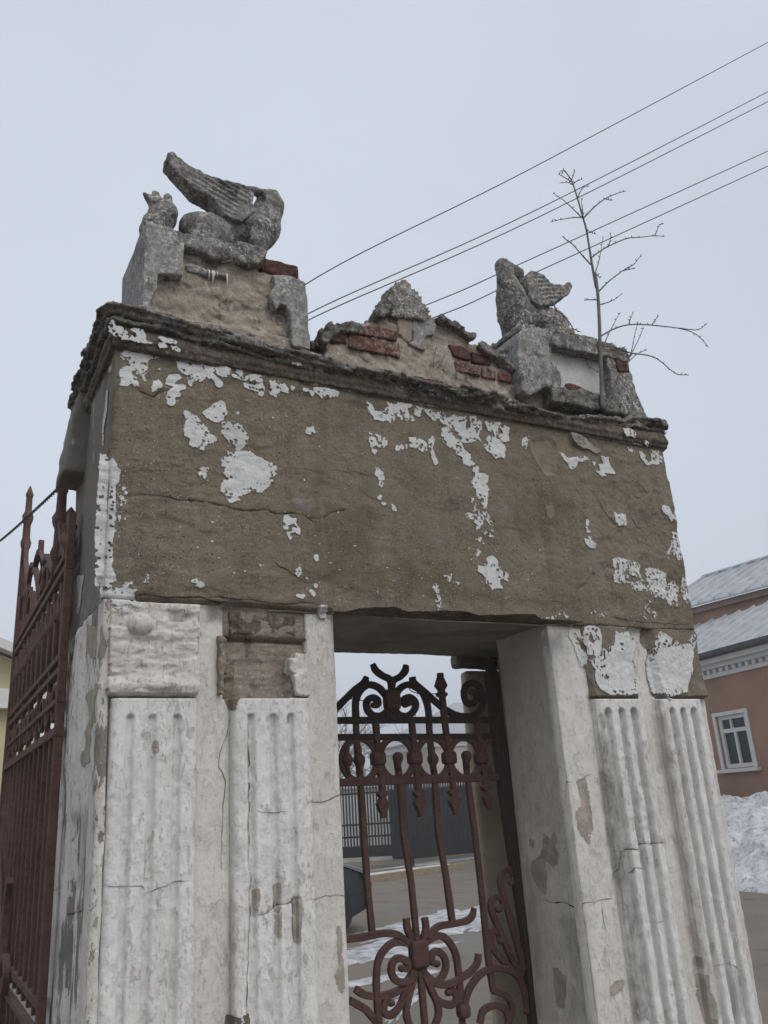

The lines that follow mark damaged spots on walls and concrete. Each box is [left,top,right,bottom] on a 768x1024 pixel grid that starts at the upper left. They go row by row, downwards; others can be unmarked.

peeling [107,320,339,503]
peeling [76,390,149,615]
crack [133,466,379,522]
peeling [366,401,615,590]
peeling [296,557,697,701]
crack [66,880,189,915]
crack [218,721,347,1010]
peeling [529,833,558,895]
peeling [575,778,594,845]
crack [542,842,664,929]